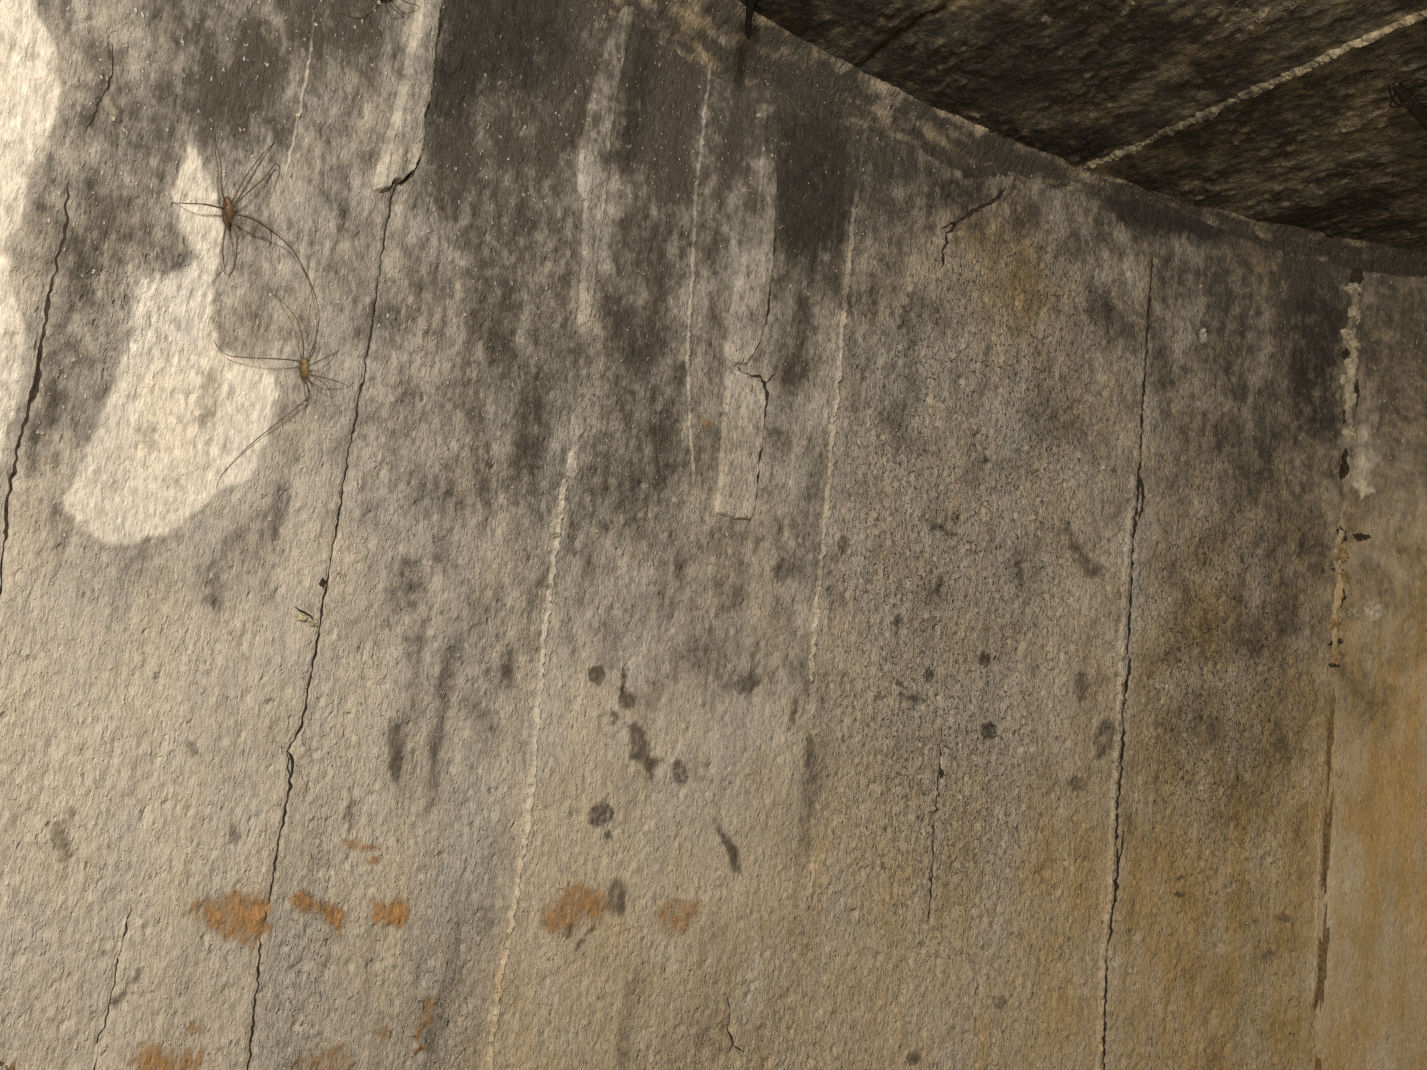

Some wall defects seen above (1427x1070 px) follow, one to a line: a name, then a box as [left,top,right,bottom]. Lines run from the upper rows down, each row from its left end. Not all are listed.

crack [435,8,447,51]
crack [0,180,70,595]
crack [246,171,413,1070]
water stain [979,651,990,667]
crack [1102,254,1154,1070]
water stain [589,667,656,778]
water stain [980,722,996,738]
corrosion [193,889,272,943]
corrosion [290,891,344,933]
corrosion [373,902,409,927]
corrosion [543,885,604,932]